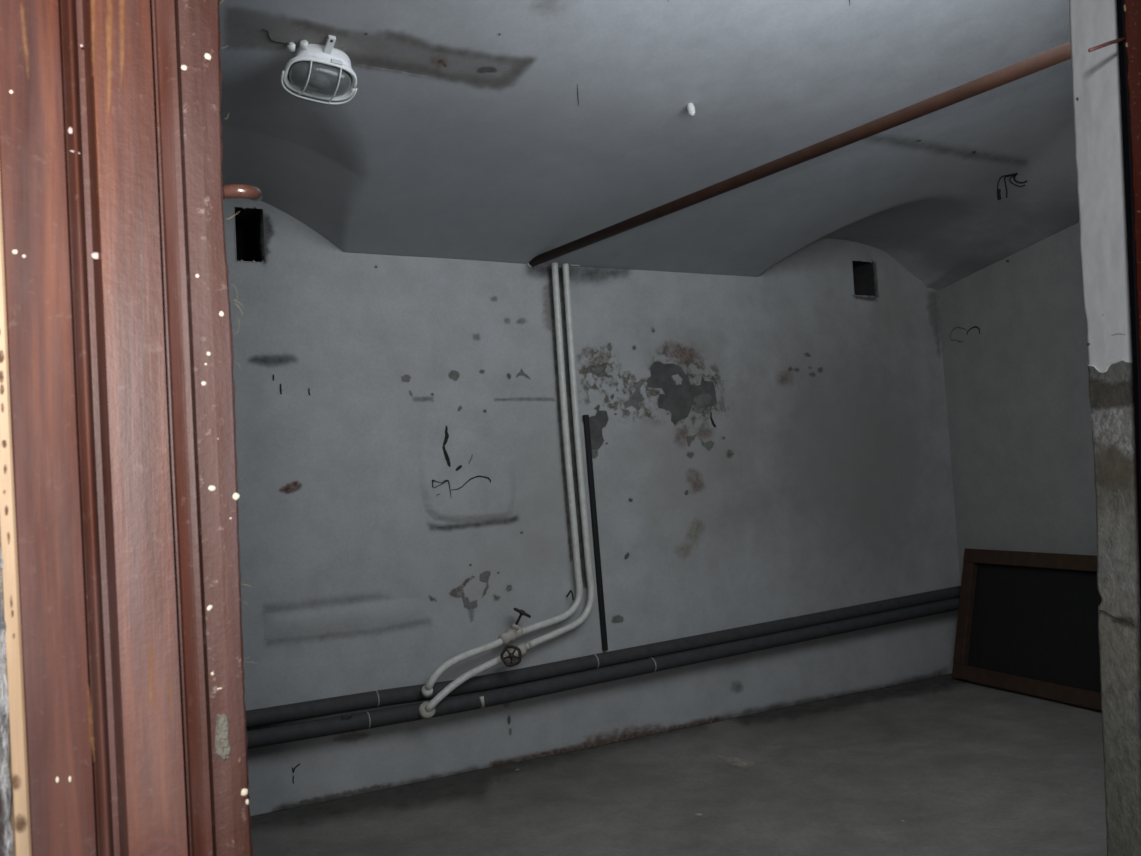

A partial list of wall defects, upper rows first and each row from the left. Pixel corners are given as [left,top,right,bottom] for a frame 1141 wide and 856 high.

water stain [230,11,531,86]
peeling [580,343,612,389]
peeling [582,361,716,458]
peeling [450,564,512,609]